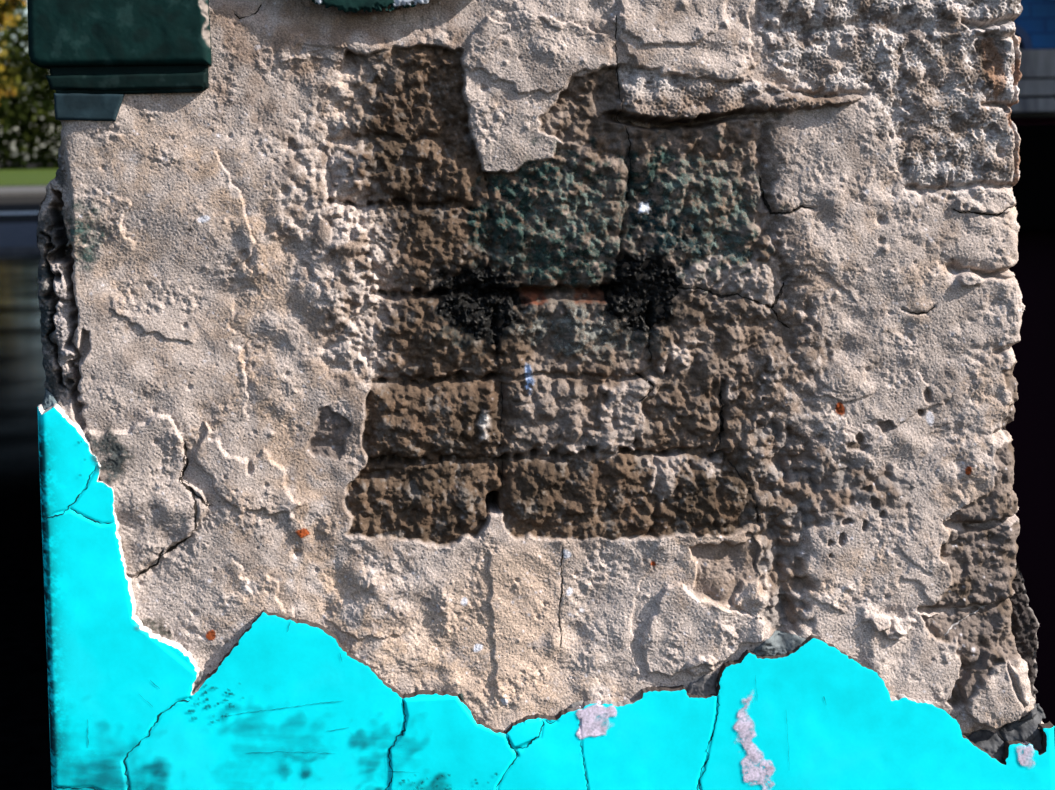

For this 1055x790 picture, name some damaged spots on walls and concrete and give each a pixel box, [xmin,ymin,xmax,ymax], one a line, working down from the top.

crack [759,176,813,215]
damp [504,303,660,361]
spalling [307,0,1023,635]
crack [135,443,211,578]
spalling [37,403,882,734]
crack [557,546,565,648]
spalling [891,442,1039,719]
spalling [962,721,1054,765]